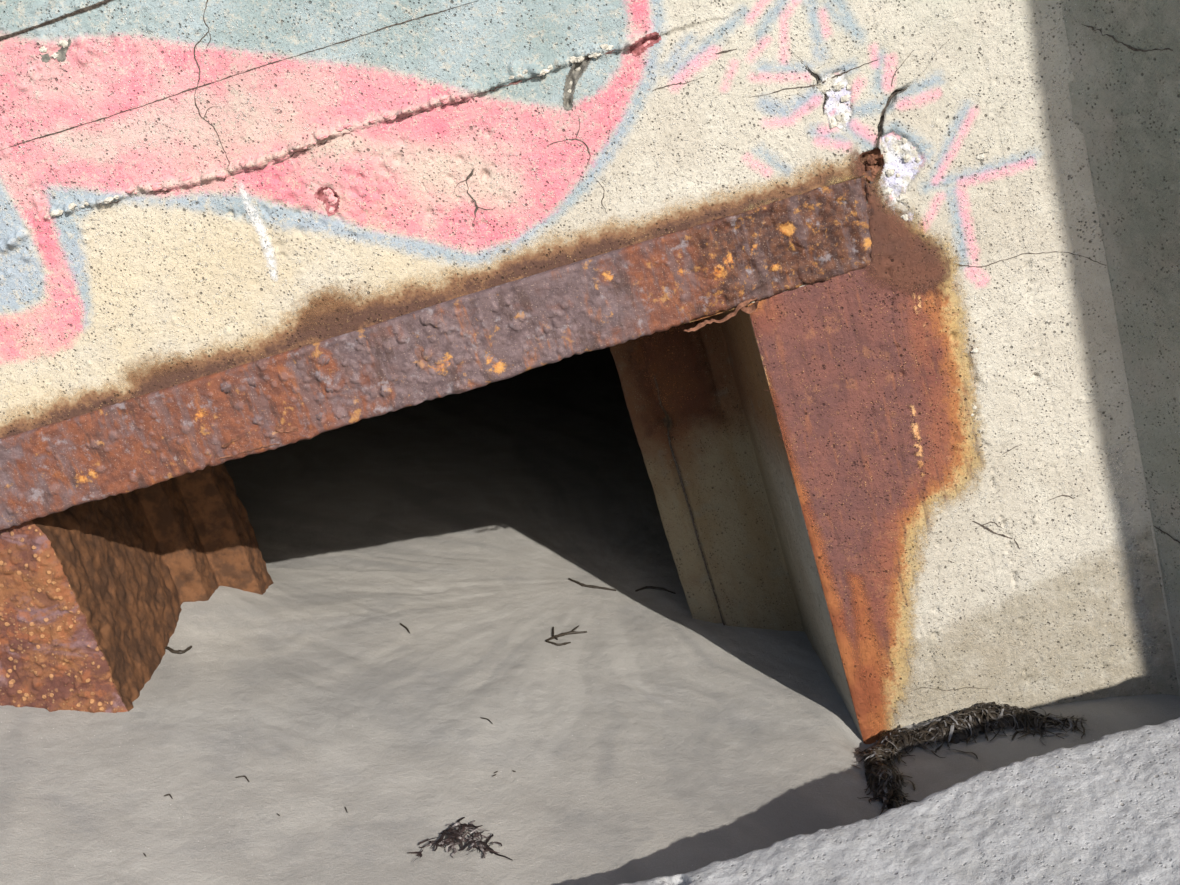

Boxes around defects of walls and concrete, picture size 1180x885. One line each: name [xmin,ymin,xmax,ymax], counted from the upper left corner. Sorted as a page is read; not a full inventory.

crack [0,0,630,217]
spalling [816,70,852,131]
crack [752,42,947,149]
crack [453,169,493,233]
spalling [859,132,923,221]
crack [953,251,1104,267]
rust [0,152,984,744]